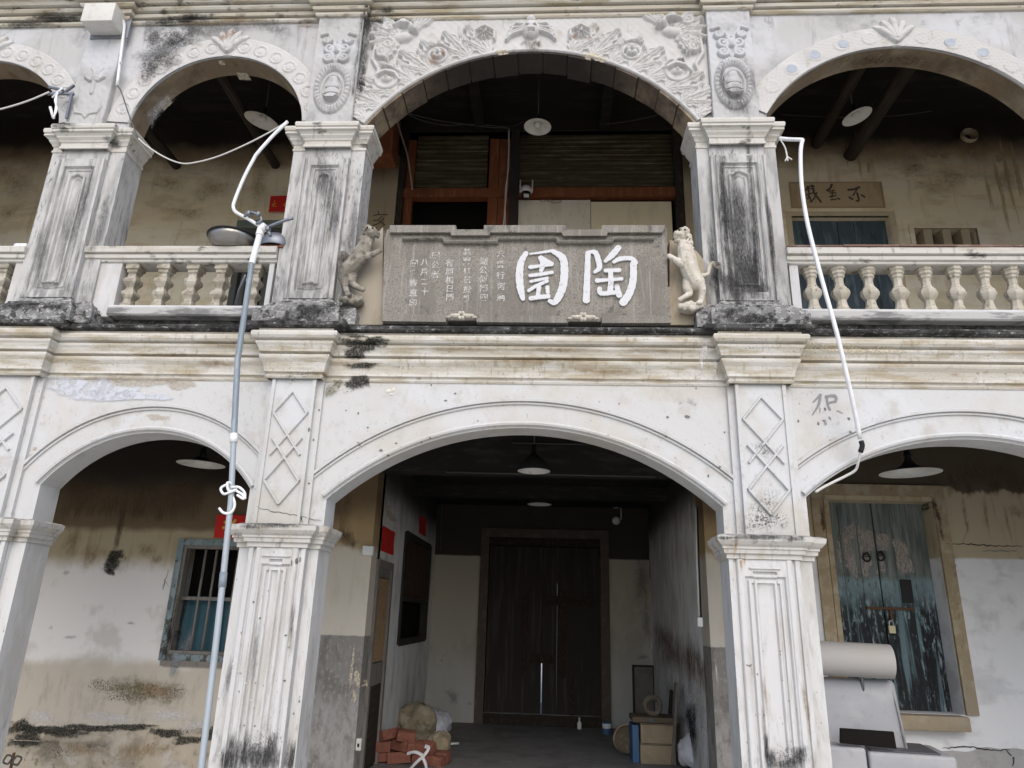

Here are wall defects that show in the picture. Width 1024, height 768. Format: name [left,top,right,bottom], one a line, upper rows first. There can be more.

damp [141,19,247,75]
damp [709,144,776,301]
mould [342,334,389,390]
flaking render [87,375,194,390]
crack [946,529,1021,552]
damp [90,550,126,576]
damp [90,680,179,701]
mould [765,737,806,768]